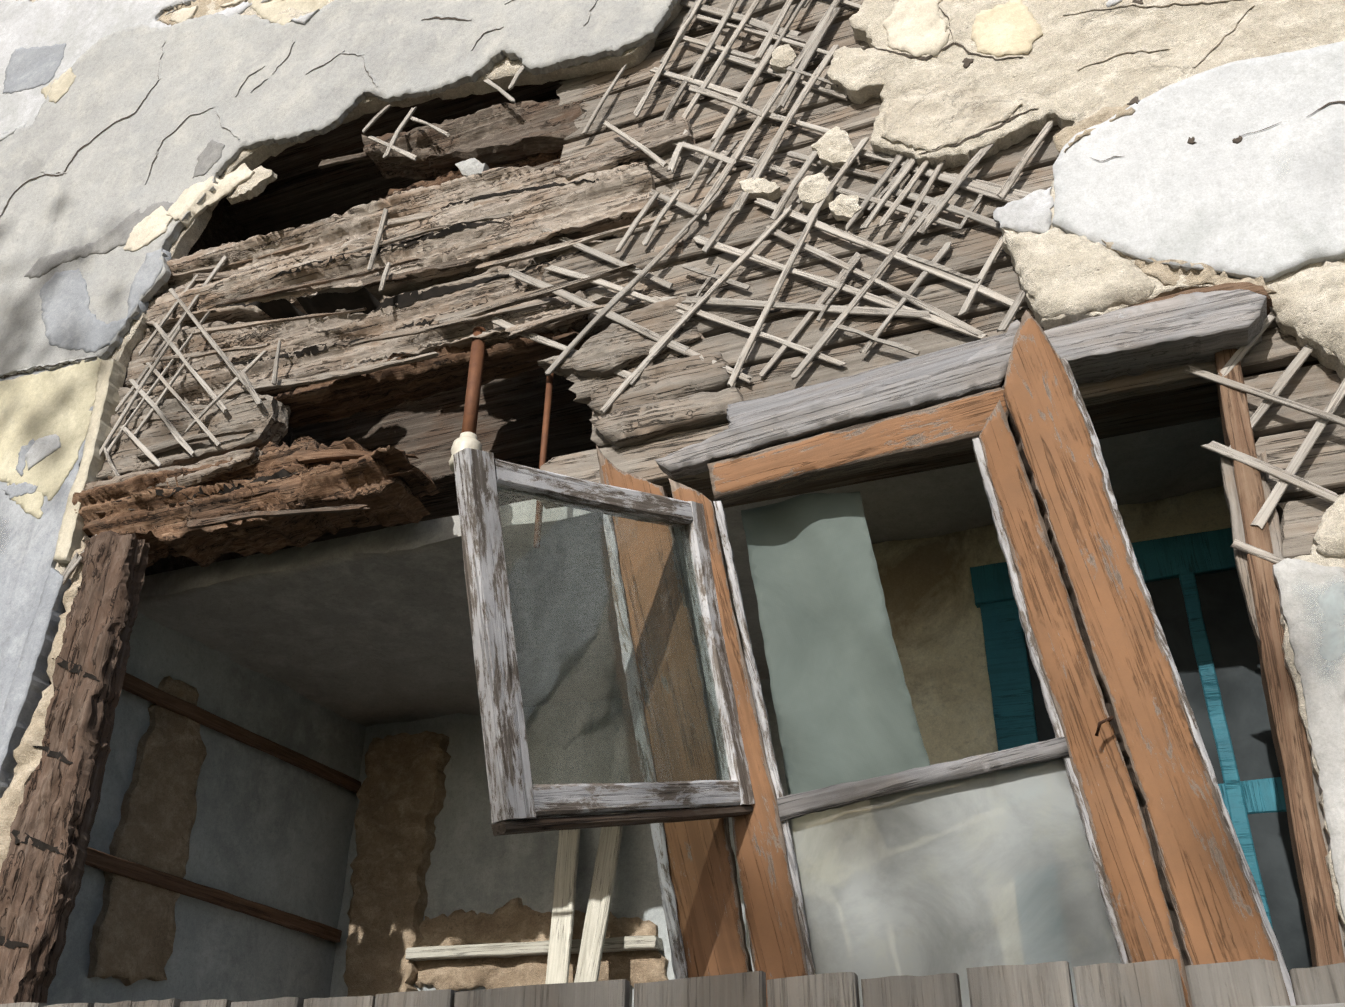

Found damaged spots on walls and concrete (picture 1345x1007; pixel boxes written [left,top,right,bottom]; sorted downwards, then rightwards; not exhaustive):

peeling [159,0,328,26]
crack [421,0,513,50]
crack [583,0,598,25]
peeling [883,0,950,58]
peeling [962,0,1043,69]
crack [1063,0,1255,71]
crack [0,0,196,216]
crack [145,35,379,184]
peeling [993,186,1054,234]
crack [218,178,599,364]
peeling [0,140,255,519]